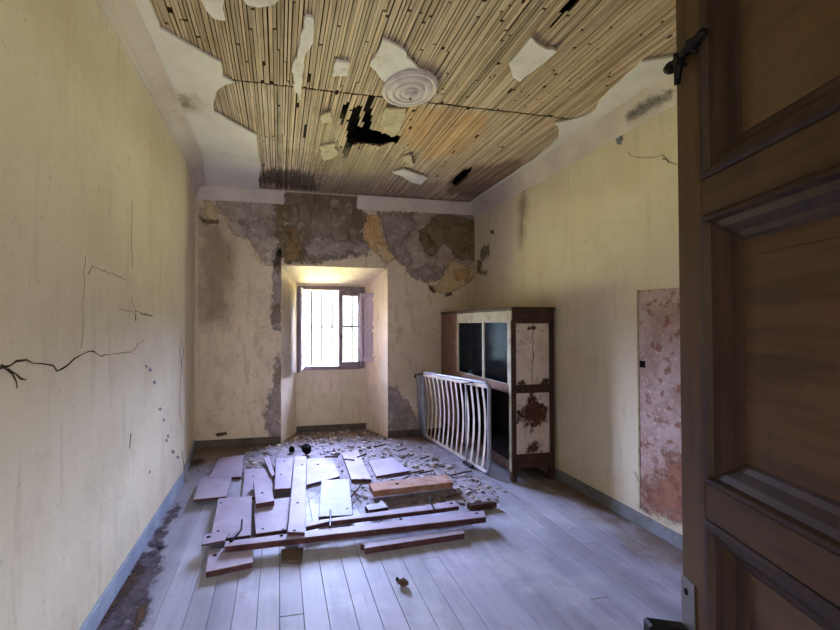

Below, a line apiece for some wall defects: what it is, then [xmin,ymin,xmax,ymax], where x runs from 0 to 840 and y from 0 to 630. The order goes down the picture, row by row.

spalling [150,0,676,202]
damp [628,90,671,119]
crack [0,204,153,389]
peeling [198,200,282,331]
peeling [363,211,475,295]